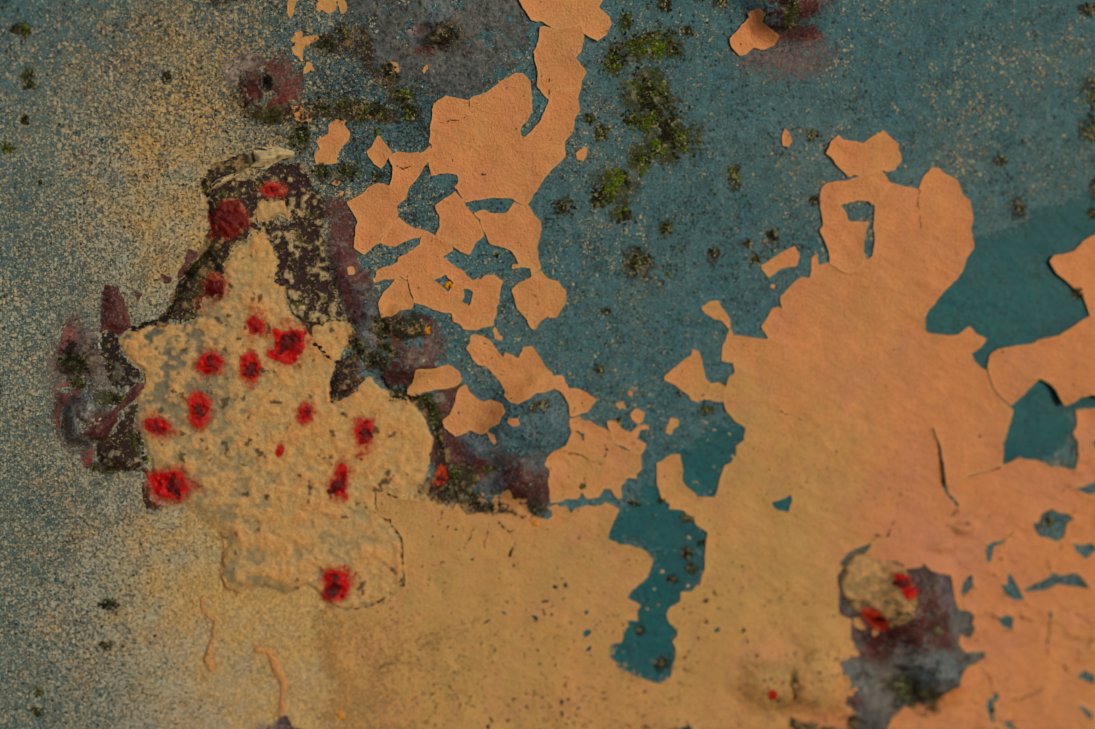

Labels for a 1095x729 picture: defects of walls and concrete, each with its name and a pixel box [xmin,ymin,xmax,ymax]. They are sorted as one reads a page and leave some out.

peeling [287,0,298,19]
peeling [311,0,347,14]
mould [1077,2,1095,17]
peeling [291,31,327,74]
peeling [291,106,312,122]
peeling [314,119,350,165]
peeling [347,0,612,341]
peeling [100,129,1095,729]
crack [933,430,960,534]